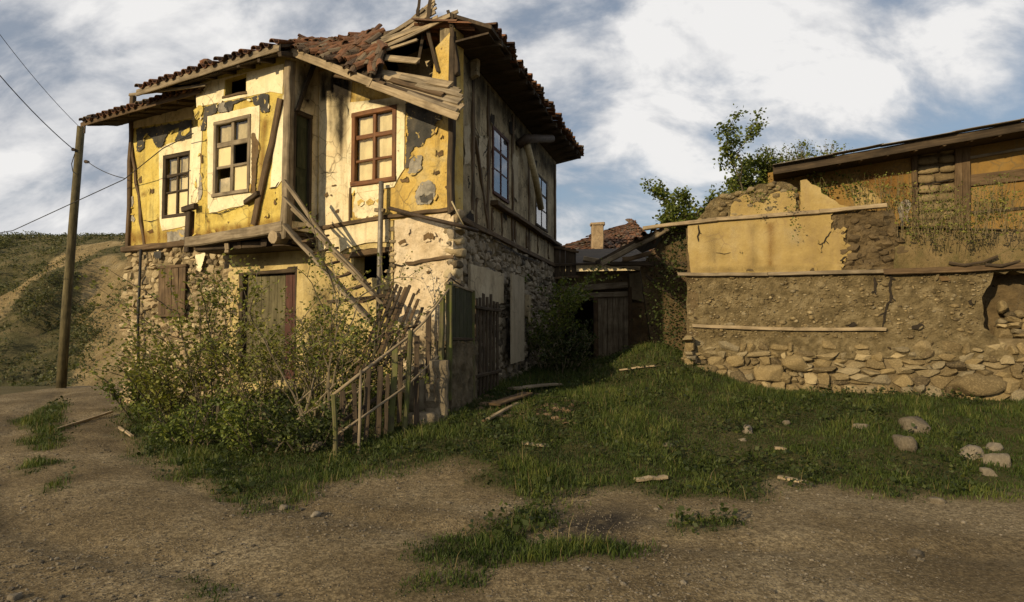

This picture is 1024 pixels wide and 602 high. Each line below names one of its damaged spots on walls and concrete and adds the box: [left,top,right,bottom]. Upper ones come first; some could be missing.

flaking render [136,93,270,152]
flaking render [400,102,447,205]
flaking render [828,183,911,270]
crack [871,275,896,327]